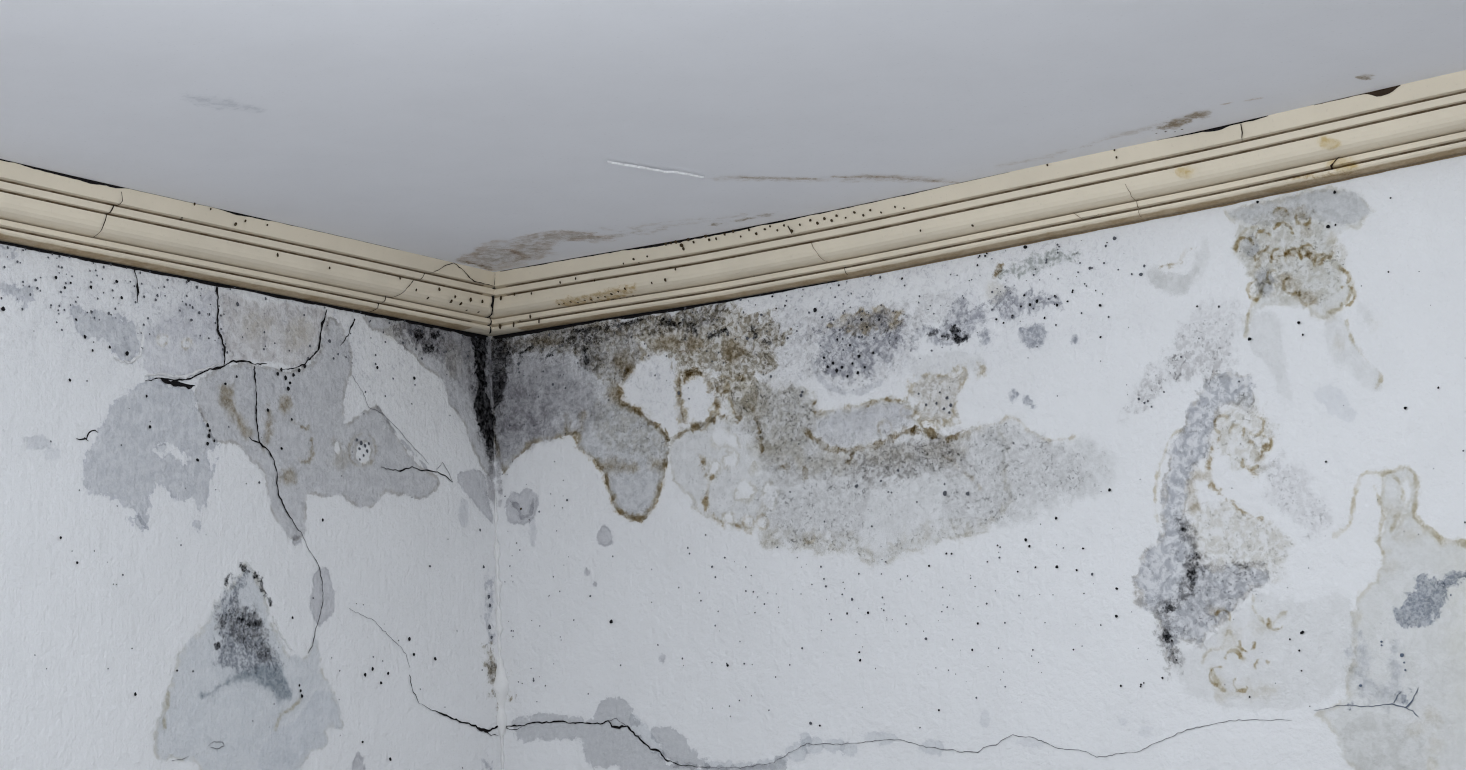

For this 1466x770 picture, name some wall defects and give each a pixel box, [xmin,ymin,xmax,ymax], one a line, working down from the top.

crack [1157,116,1267,141]
crack [1316,85,1401,105]
damp [1,246,290,354]
peeling [146,363,220,379]
damp [276,306,353,391]
damp [353,275,894,475]
damp [901,277,978,359]
crack [0,153,1466,769]
damp [798,427,956,462]